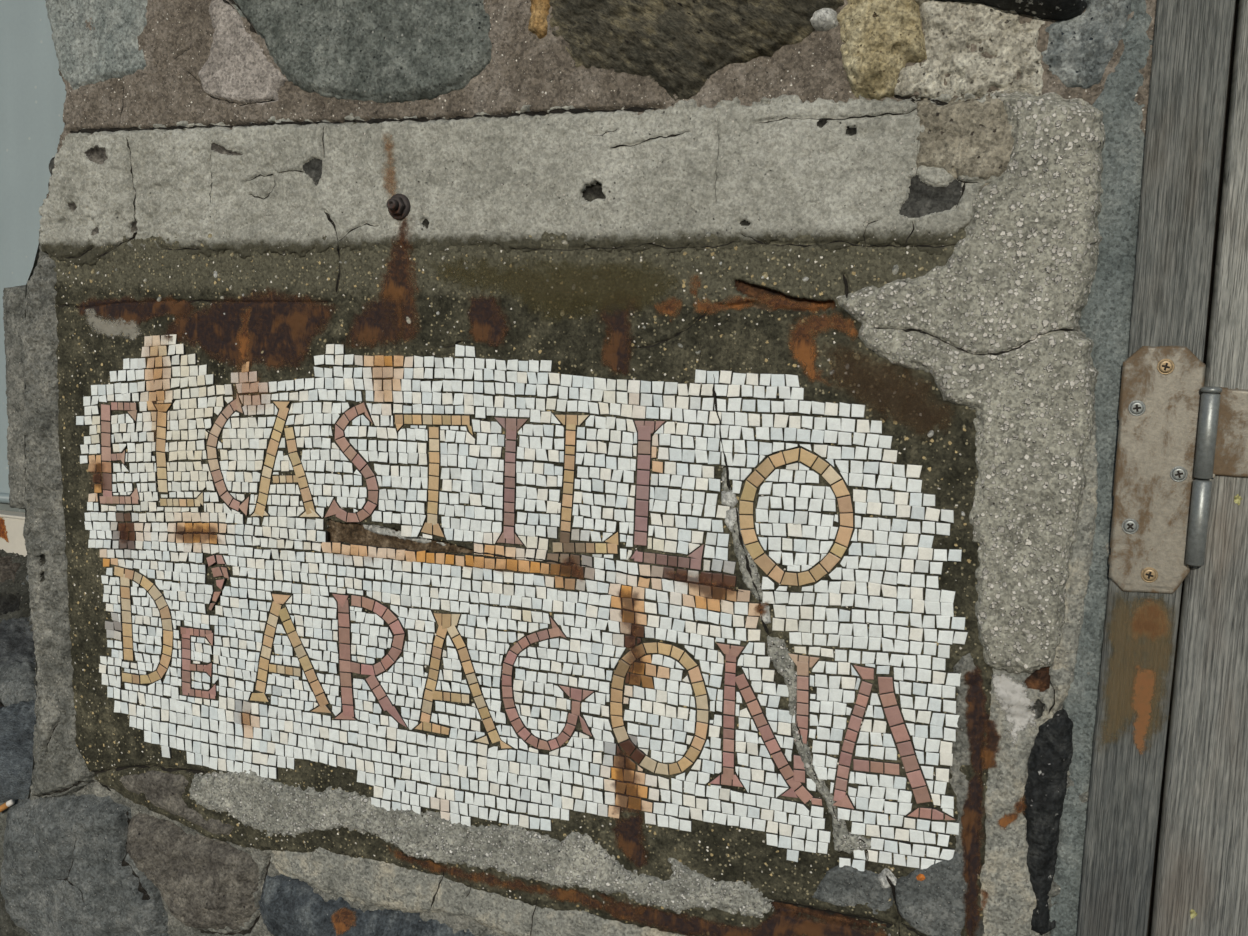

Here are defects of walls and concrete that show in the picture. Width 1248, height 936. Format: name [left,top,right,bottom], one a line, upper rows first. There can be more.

corrosion [385,138,395,195]
spalling [899,91,1014,218]
corrosion [350,218,418,347]
corrosion [79,289,334,369]
corrosion [654,275,857,380]
crack [873,327,1077,356]
crack [473,312,924,936]
spalling [1024,666,1050,719]
corrosion [614,814,647,867]
corrosion [961,667,1001,936]
corrosion [999,798,1026,828]
corrosion [394,851,886,936]